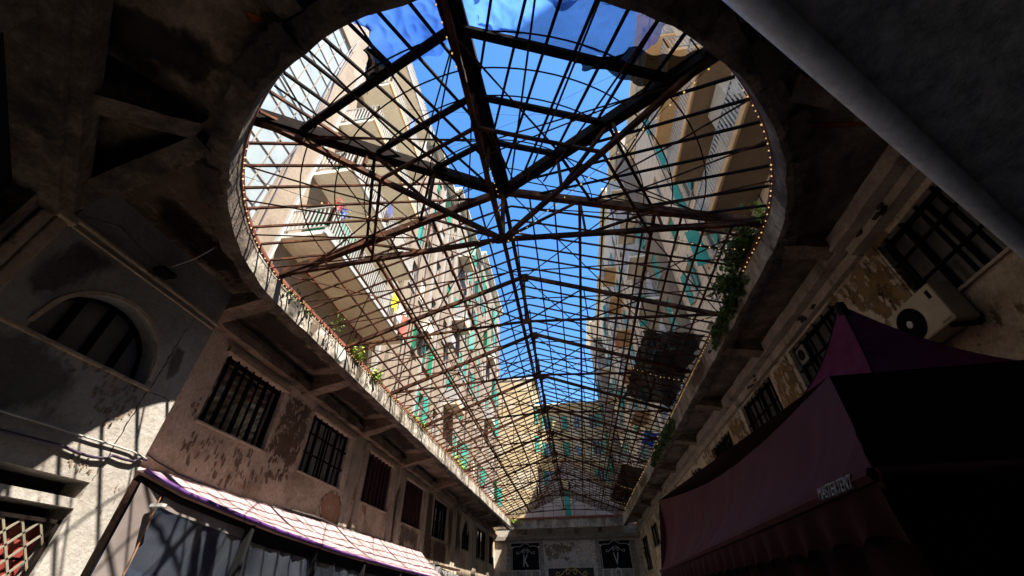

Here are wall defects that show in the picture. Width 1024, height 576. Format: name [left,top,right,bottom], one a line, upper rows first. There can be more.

peeling [837,245,912,319]
peeling [774,355,805,407]
peeling [180,395,312,489]